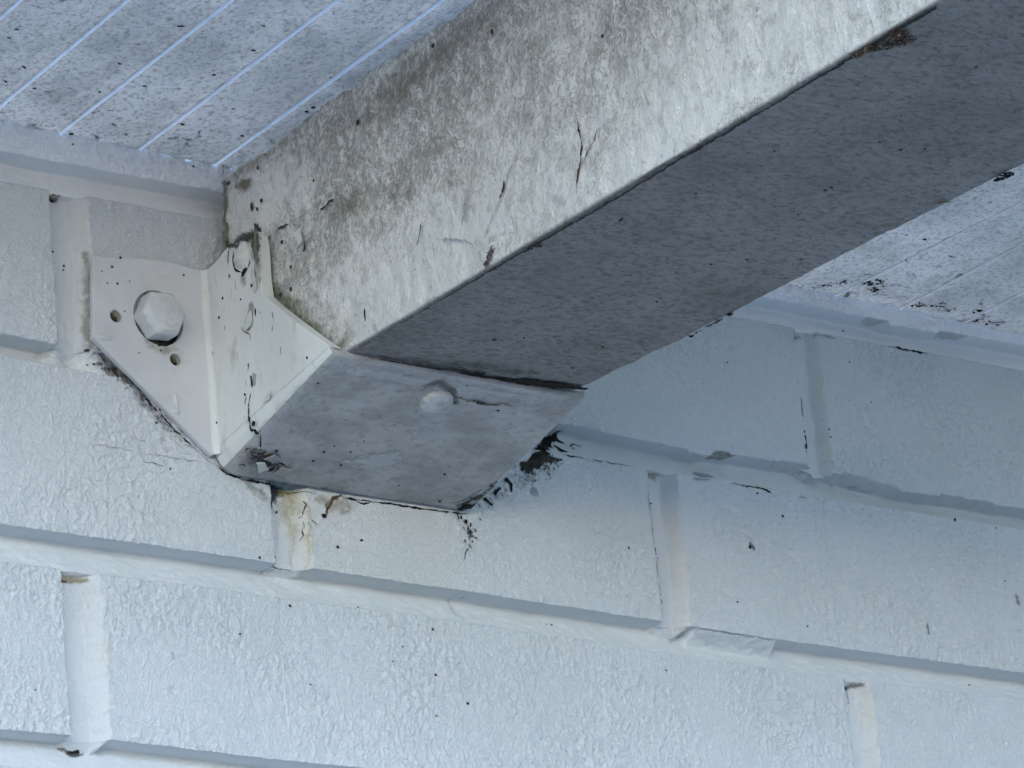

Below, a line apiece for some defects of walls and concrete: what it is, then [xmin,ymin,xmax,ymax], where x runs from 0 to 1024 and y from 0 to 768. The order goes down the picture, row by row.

crack [563,120,598,206]
peeling [238,449,292,479]
leakage [343,430,623,563]